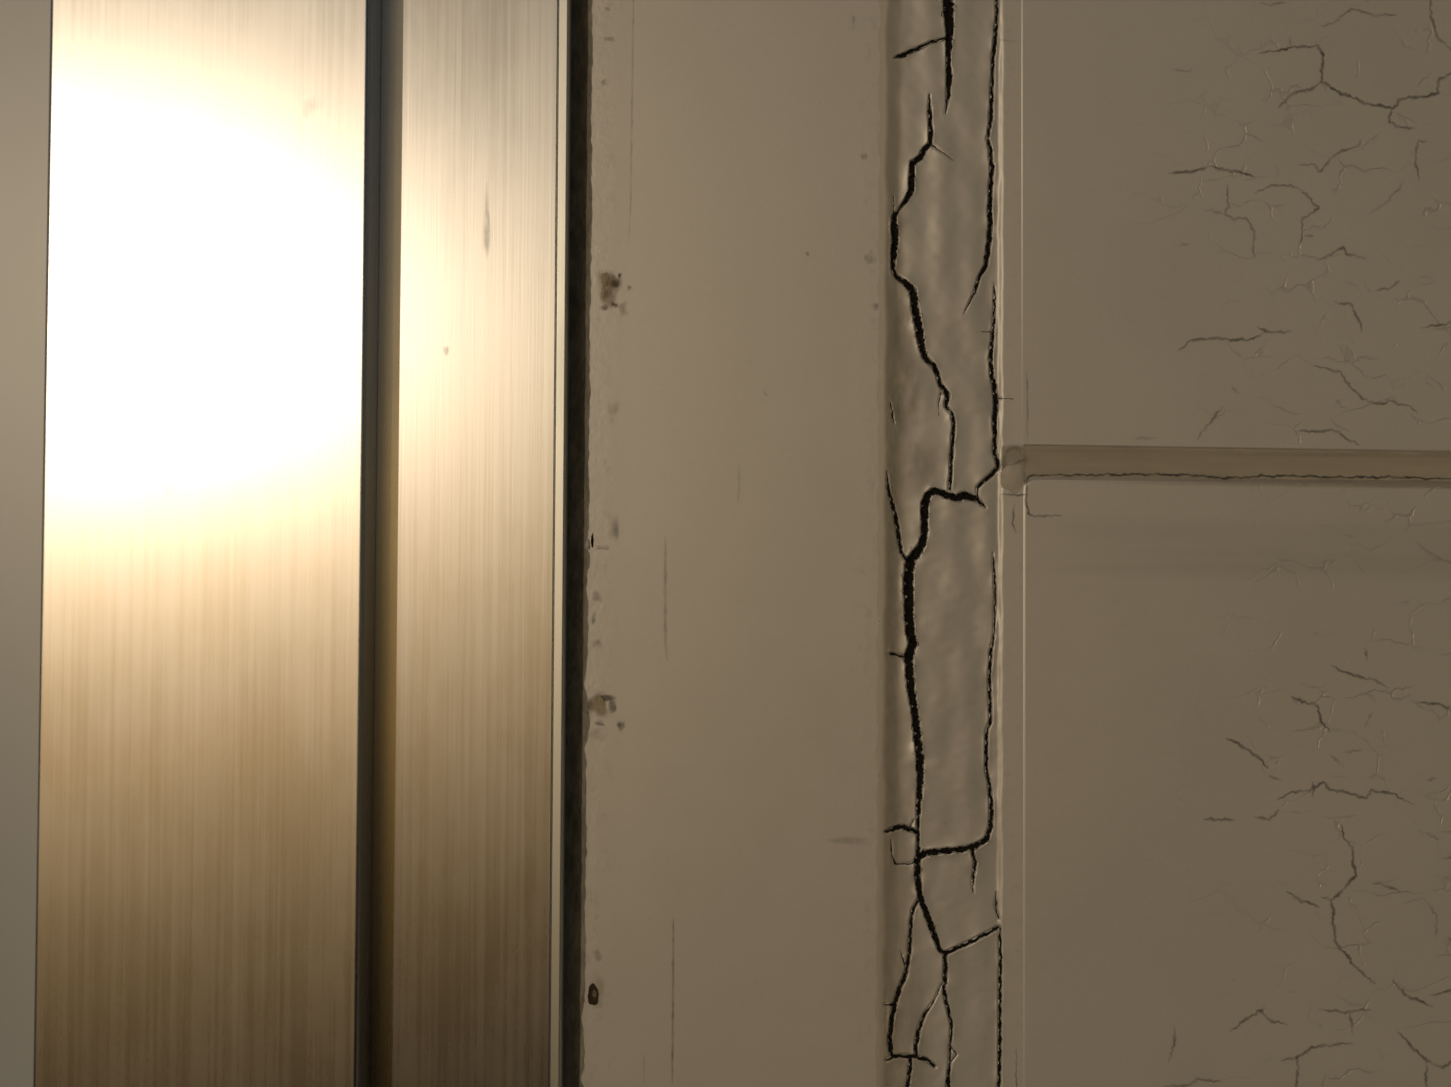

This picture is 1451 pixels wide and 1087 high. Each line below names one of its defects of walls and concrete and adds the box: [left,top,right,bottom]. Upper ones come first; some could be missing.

crack [885,0,1445,1087]